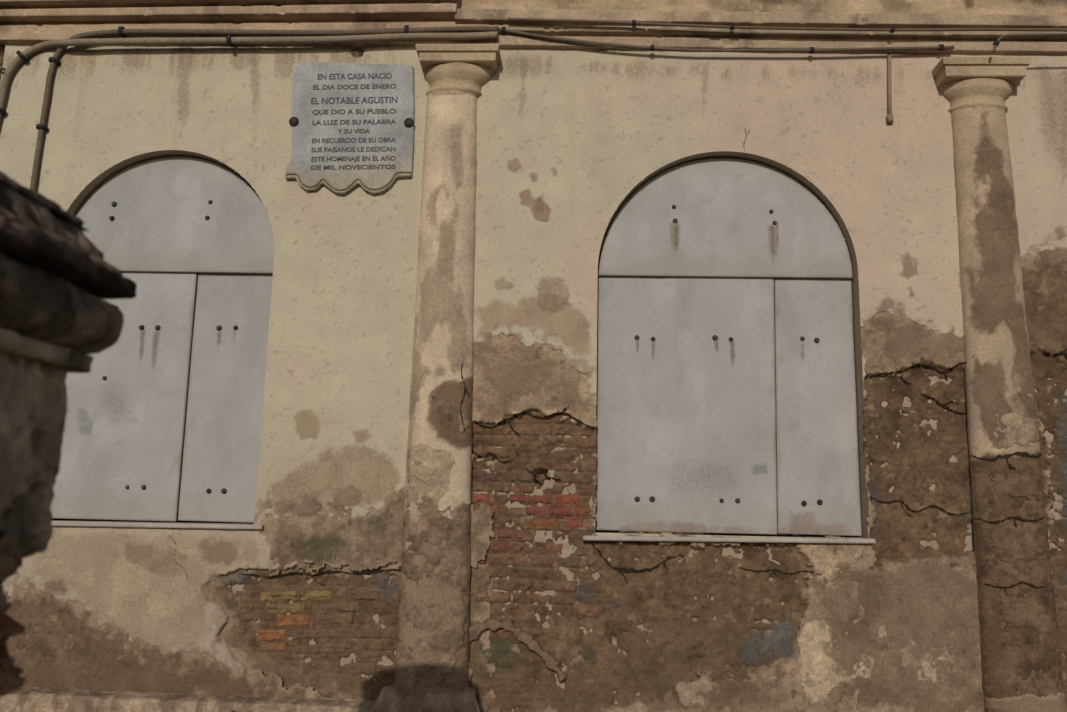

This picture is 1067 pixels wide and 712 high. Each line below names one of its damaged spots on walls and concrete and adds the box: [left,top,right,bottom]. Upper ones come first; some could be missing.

flaking render [520,173,551,222]
water stain [411,125,465,414]
water stain [969,114,1036,442]
crack [460,359,594,485]
flaking render [0,229,1067,712]
crack [970,451,1041,469]
crack [985,581,1050,596]